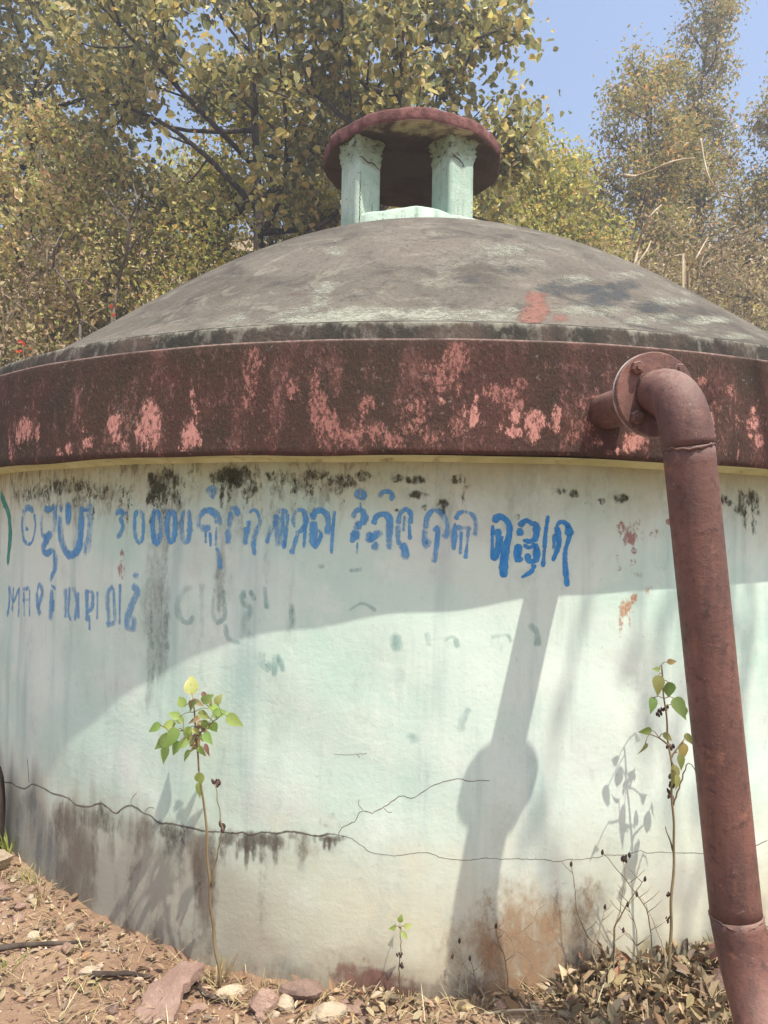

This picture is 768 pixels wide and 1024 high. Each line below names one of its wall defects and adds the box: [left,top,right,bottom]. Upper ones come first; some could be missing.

peeling [56,396,161,455]
peeling [178,389,203,451]
peeling [309,342,649,455]
peeling [735,406,764,459]
damp [146,467,185,522]
damp [210,466,371,510]
damp [394,474,426,511]
rust [617,521,637,553]
rust [619,595,637,625]
crack [4,759,703,862]
damp [193,833,282,920]
rust [473,907,562,998]